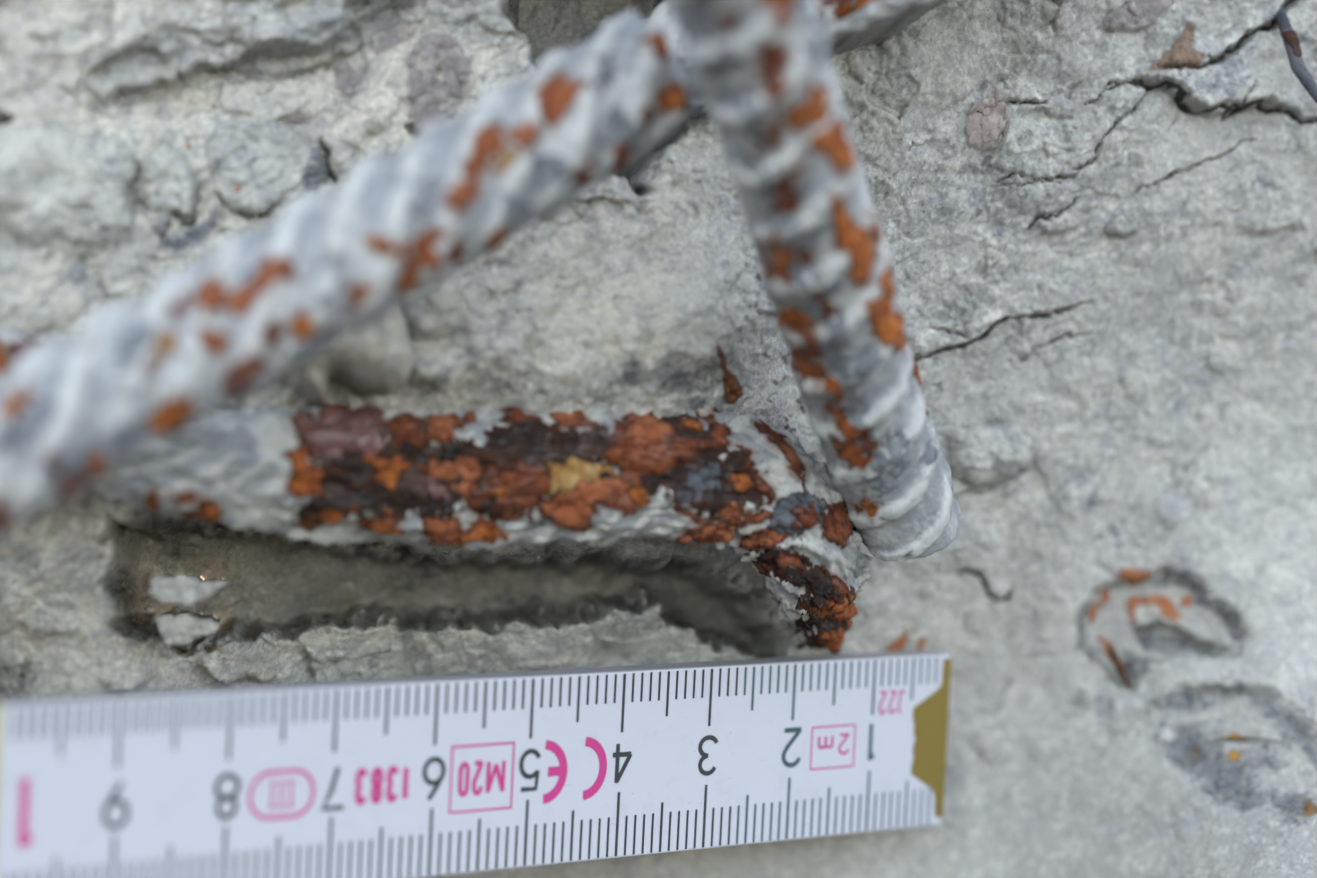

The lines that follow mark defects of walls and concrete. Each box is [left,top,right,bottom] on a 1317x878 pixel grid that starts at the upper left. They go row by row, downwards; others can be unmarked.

crack [998,0,1317,230]
spalling [0,0,1130,659]
corrosion [717,345,743,404]
crack [916,301,1093,363]
corrosion [1088,589,1133,689]
corrosion [1119,568,1192,626]